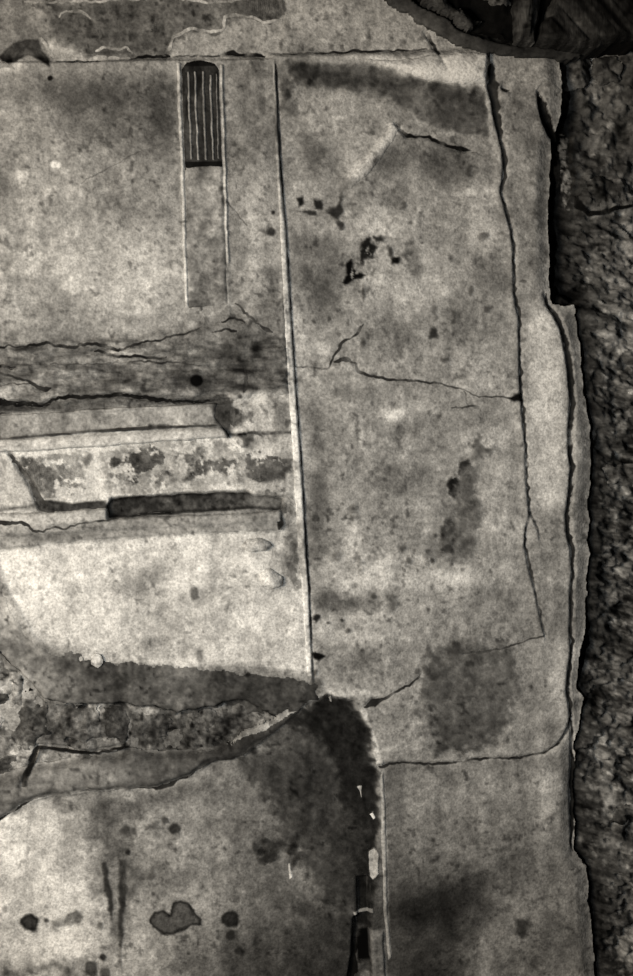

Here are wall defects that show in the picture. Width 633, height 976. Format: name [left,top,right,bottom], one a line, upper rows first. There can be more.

damp [281,63,488,135]
flaking render [342,235,399,299]
crack [0,331,212,414]
crack [329,56,545,654]
peeling [19,454,92,498]
peeling [109,431,293,515]
crack [296,395,313,672]
crack [378,293,576,851]
spalling [0,652,276,773]
damp [238,695,380,934]
damp [20,911,82,931]
damp [149,901,201,935]